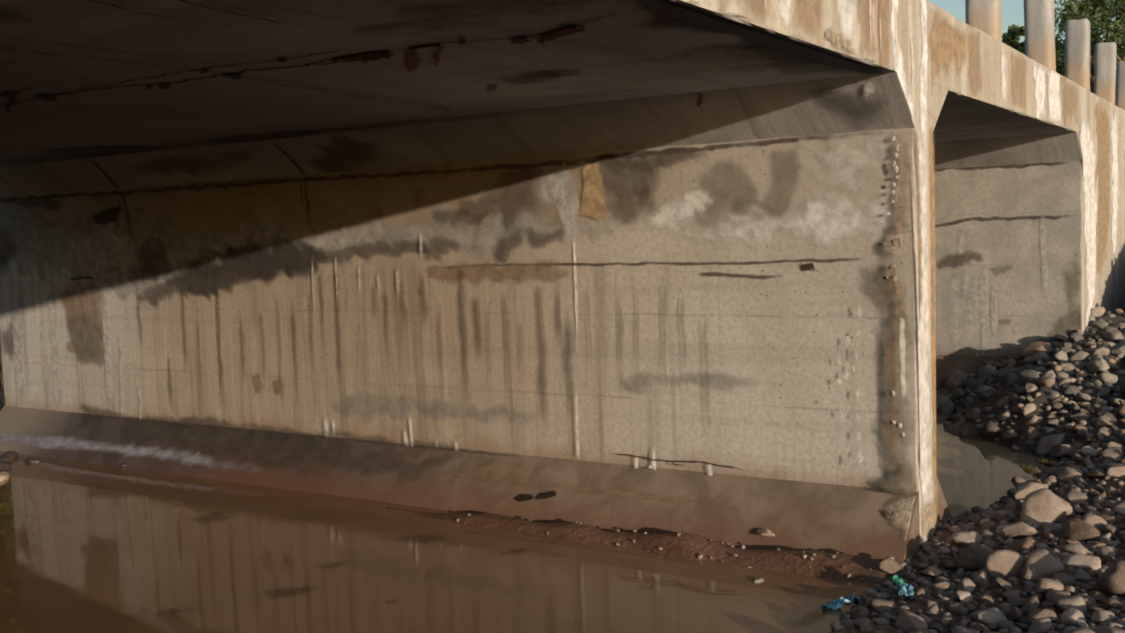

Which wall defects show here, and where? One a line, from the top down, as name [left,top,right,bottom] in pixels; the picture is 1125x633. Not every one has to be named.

crack [0,14,619,114]
rust [931,18,966,76]
leakage [0,297,24,399]
leakage [41,285,122,418]
leakage [138,390,239,430]
leakage [543,161,654,318]
leakage [625,0,979,541]
rust [929,130,937,531]